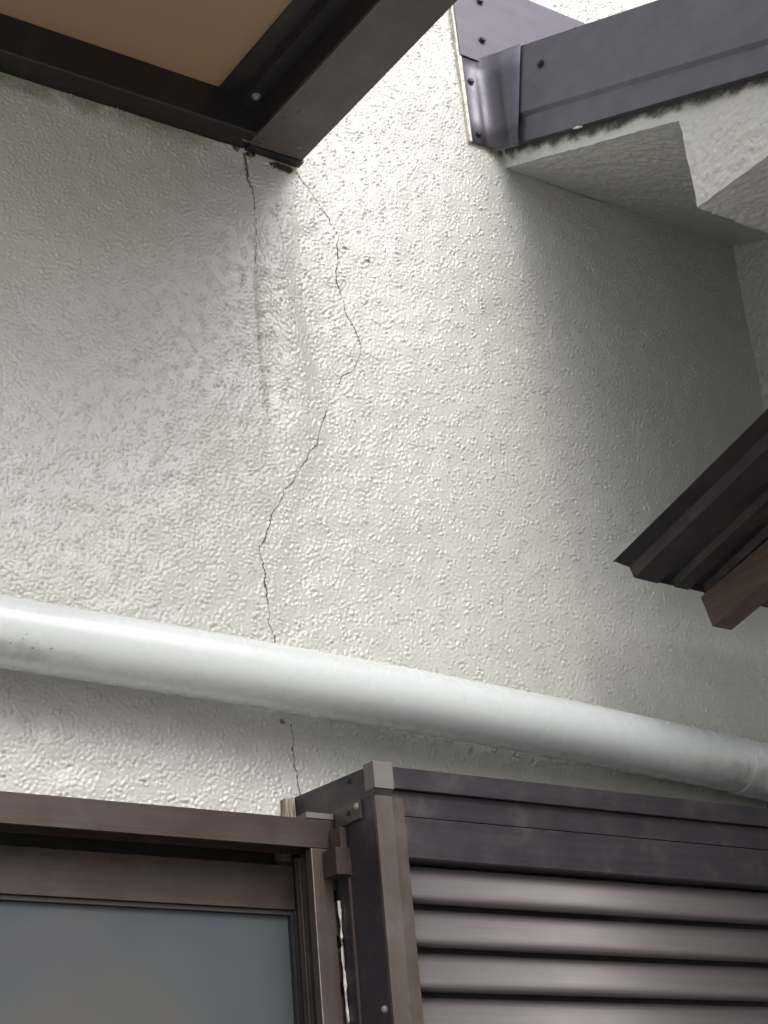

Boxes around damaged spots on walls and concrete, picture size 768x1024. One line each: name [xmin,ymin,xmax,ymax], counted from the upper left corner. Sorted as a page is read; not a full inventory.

crack [242,152,283,262]
crack [259,172,379,643]
crack [290,724,301,795]